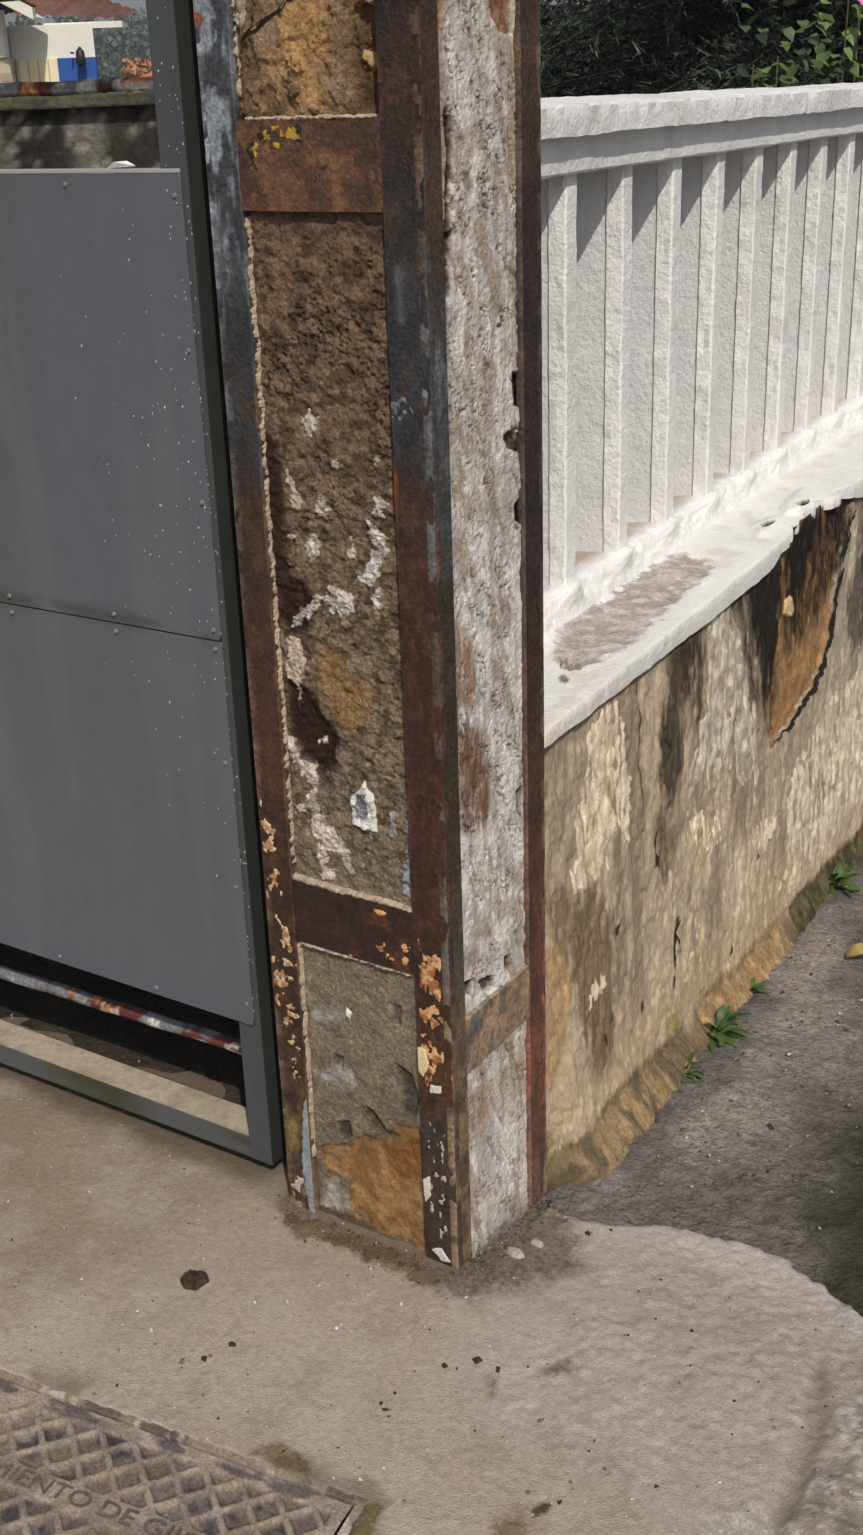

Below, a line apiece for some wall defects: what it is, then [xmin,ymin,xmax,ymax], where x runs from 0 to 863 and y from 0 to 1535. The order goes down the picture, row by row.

crack [240,0,291,42]
peeling [285,469,332,562]
peeling [284,496,391,706]
peeling [553,553,714,682]
peeling [287,735,356,881]
corrosion [455,627,488,832]
peeling [568,700,632,904]
damp [658,629,703,880]
peeling [685,499,863,1038]
spalling [291,1047,451,1263]
corrosion [376,939,444,1086]
spalling [565,1030,697,1183]